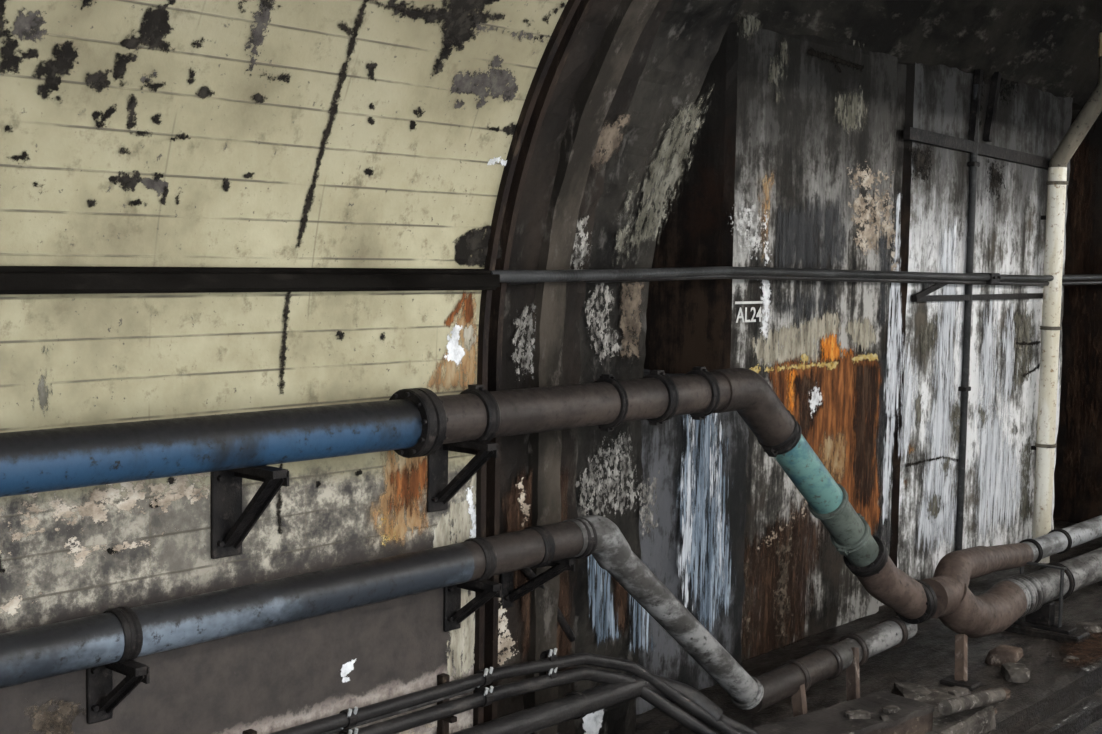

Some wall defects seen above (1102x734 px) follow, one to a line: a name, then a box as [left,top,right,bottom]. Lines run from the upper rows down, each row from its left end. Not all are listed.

peeling [0,0,176,137]
peeling [108,170,183,206]
crack [295,0,405,248]
peeling [388,0,566,109]
leakage [615,93,710,264]
crack [275,463,283,535]
crack [279,292,292,394]
corrosion [370,450,428,545]
leakage [676,413,732,633]
corrosion [768,329,882,535]
leakage [873,194,962,552]
leakage [974,287,1023,545]